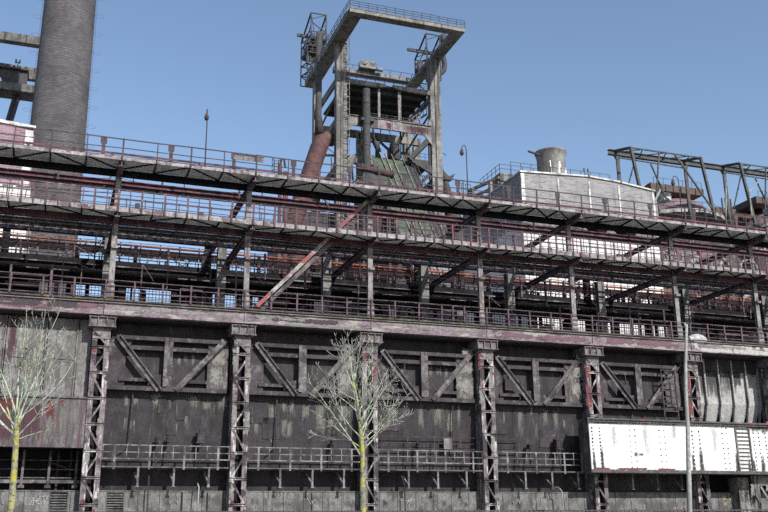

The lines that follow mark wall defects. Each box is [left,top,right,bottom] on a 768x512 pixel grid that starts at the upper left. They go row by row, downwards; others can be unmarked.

leakage [698,371,755,396]
corrosion [0,398,64,442]